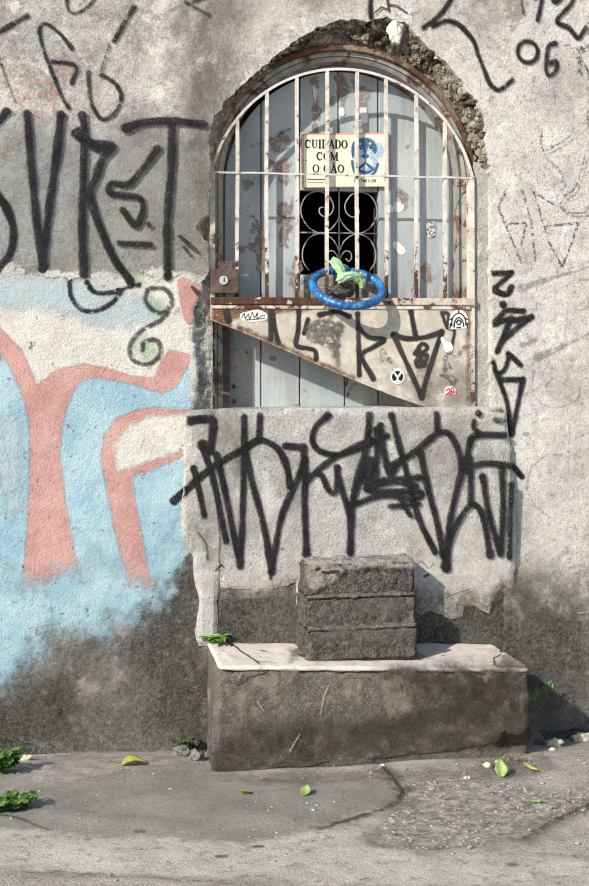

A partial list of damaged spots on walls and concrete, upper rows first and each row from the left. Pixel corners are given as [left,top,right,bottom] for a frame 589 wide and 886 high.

crack [374,0,408,13]
spalling [208,18,488,176]
peeling [268,135,292,184]
peeling [0,261,25,277]
peeling [91,271,127,290]
spalling [185,252,213,410]
corrosion [212,304,355,379]
peeling [416,590,525,667]
leakage [0,558,208,785]
leakage [501,588,589,770]
crack [319,762,404,828]
crack [522,803,589,839]